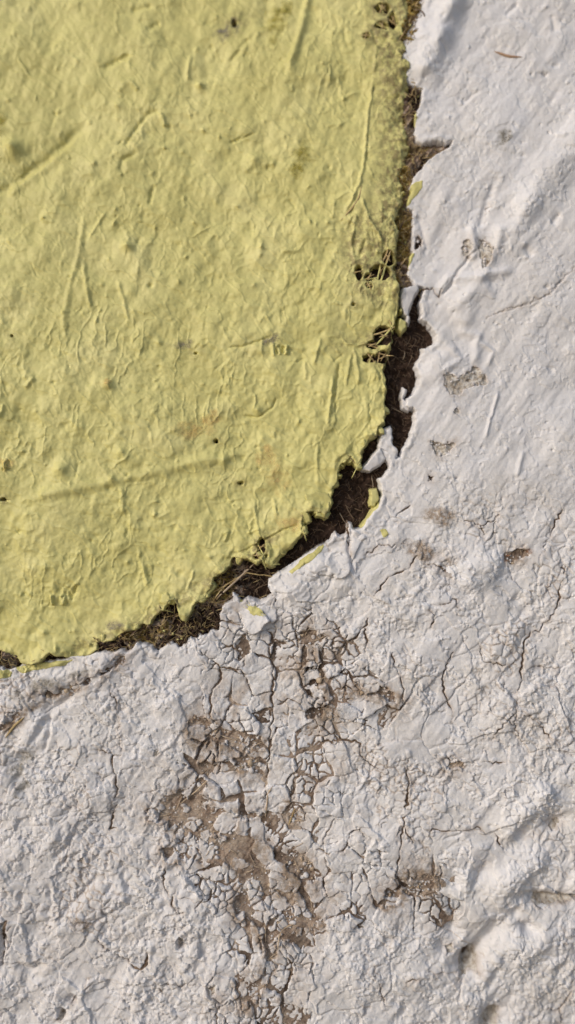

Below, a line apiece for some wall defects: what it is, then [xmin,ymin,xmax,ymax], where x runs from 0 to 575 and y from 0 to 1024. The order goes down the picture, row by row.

peeling [400,0,425,59]
peeling [0,79,450,730]
spalling [443,367,487,395]
crack [160,600,501,1024]